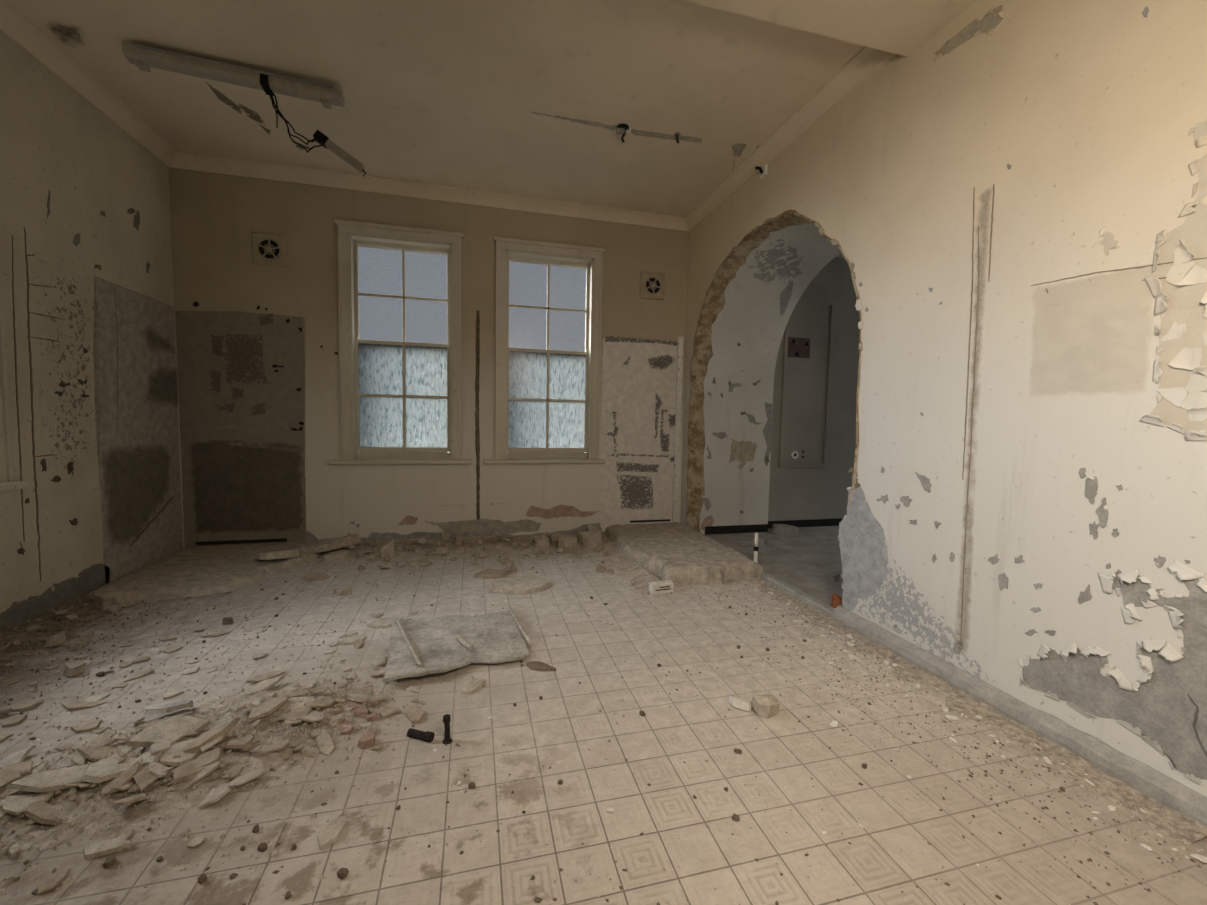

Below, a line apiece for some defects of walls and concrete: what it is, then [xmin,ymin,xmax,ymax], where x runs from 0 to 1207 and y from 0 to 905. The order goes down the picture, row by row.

peeling [934,5,1004,62]
peeling [1139,121,1207,441]
flaking render [0,210,995,681]
peeling [988,554,1025,591]
peeling [754,586,920,710]
peeling [936,688,982,743]
flaking render [1018,555,1207,785]